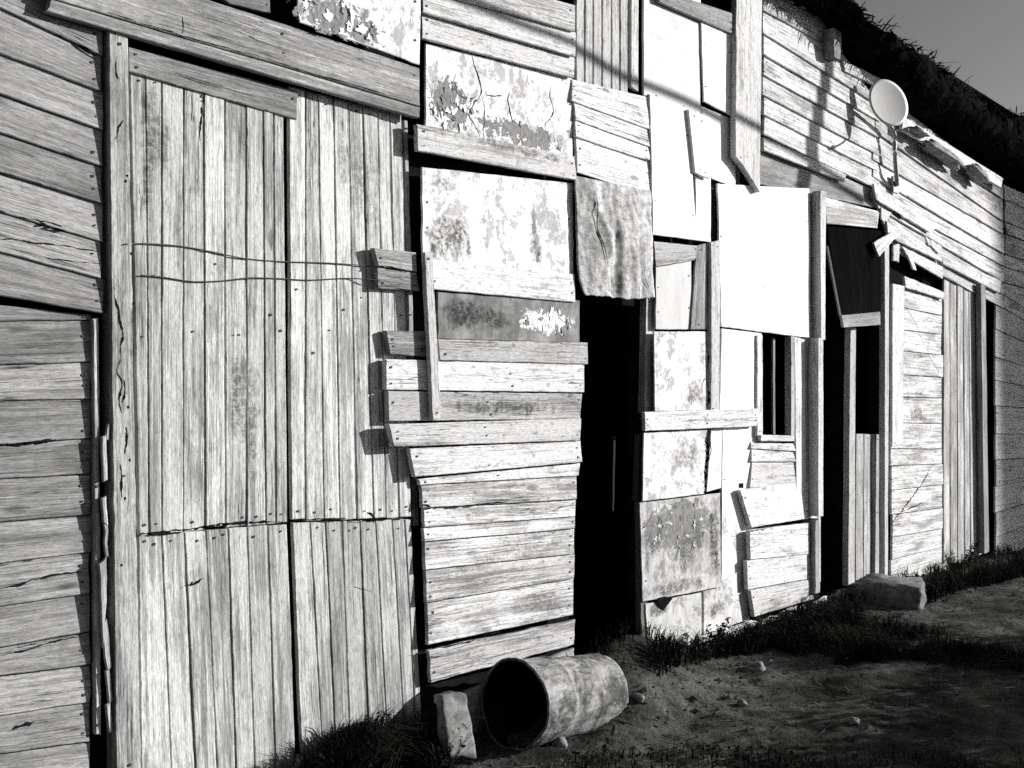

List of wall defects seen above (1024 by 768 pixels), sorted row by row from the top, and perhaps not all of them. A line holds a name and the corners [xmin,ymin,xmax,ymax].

peeling [289,0,385,48]
crack [454,57,513,138]
peeling [427,75,563,151]
peeling [519,306,575,337]
crack [114,287,128,498]
crack [2,439,56,447]
crack [136,500,526,537]
peeling [640,492,717,558]
crack [893,468,930,522]
crack [0,570,92,589]